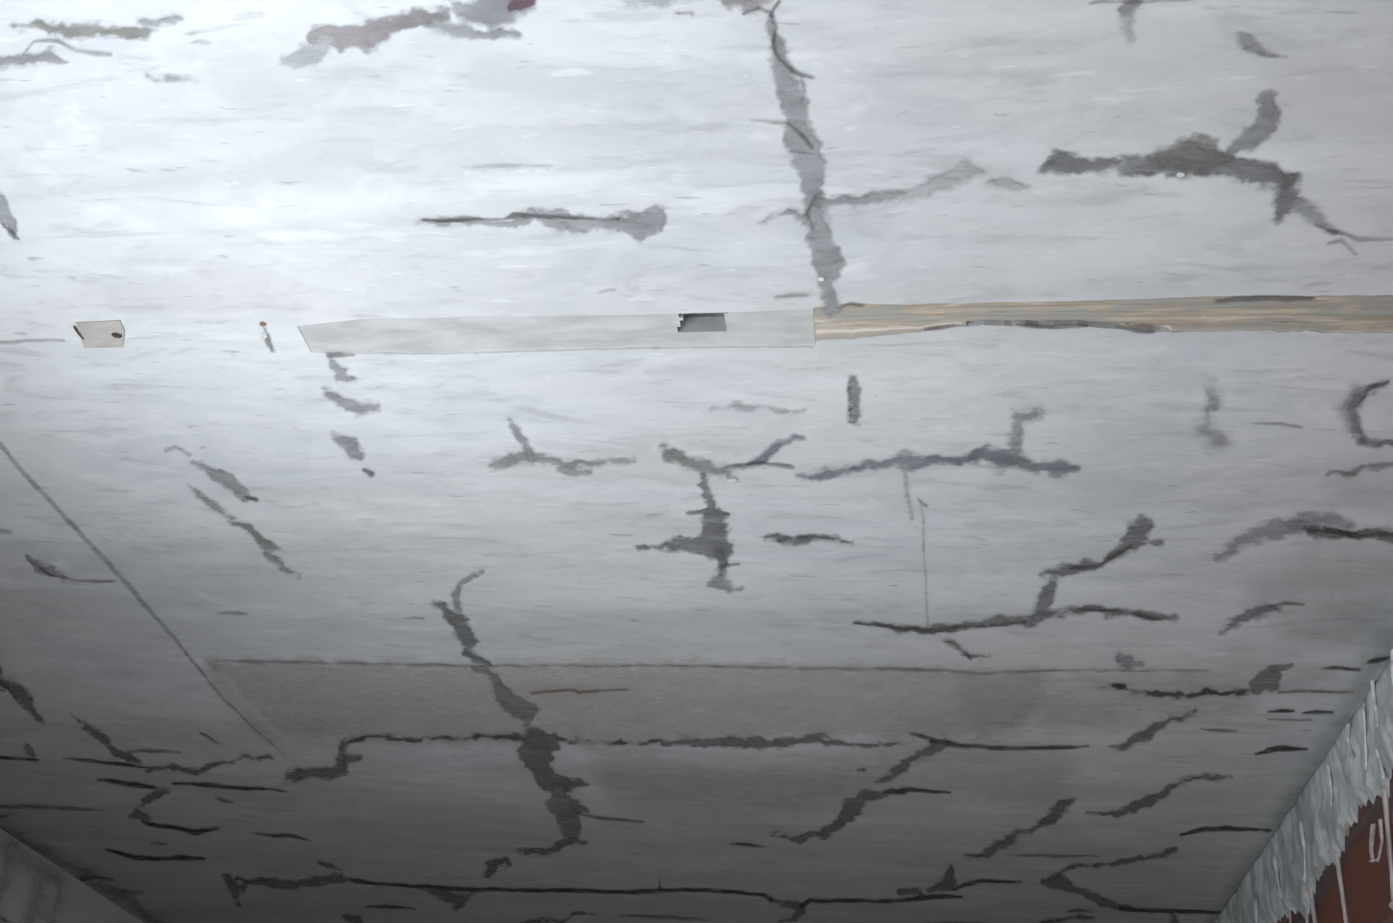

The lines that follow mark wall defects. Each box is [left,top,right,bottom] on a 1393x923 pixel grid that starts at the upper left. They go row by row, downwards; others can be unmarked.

crack [721,0,1336,316]
crack [423,208,665,240]
crack [490,424,630,476]
crack [662,436,803,484]
crack [800,412,1078,501]
crack [193,465,293,573]
crack [872,518,1174,659]
crack [1215,515,1393,560]
crack [0,571,963,923]
crack [613,665,1332,858]
crack [1040,826,1271,923]
water stain [1293,792,1393,923]